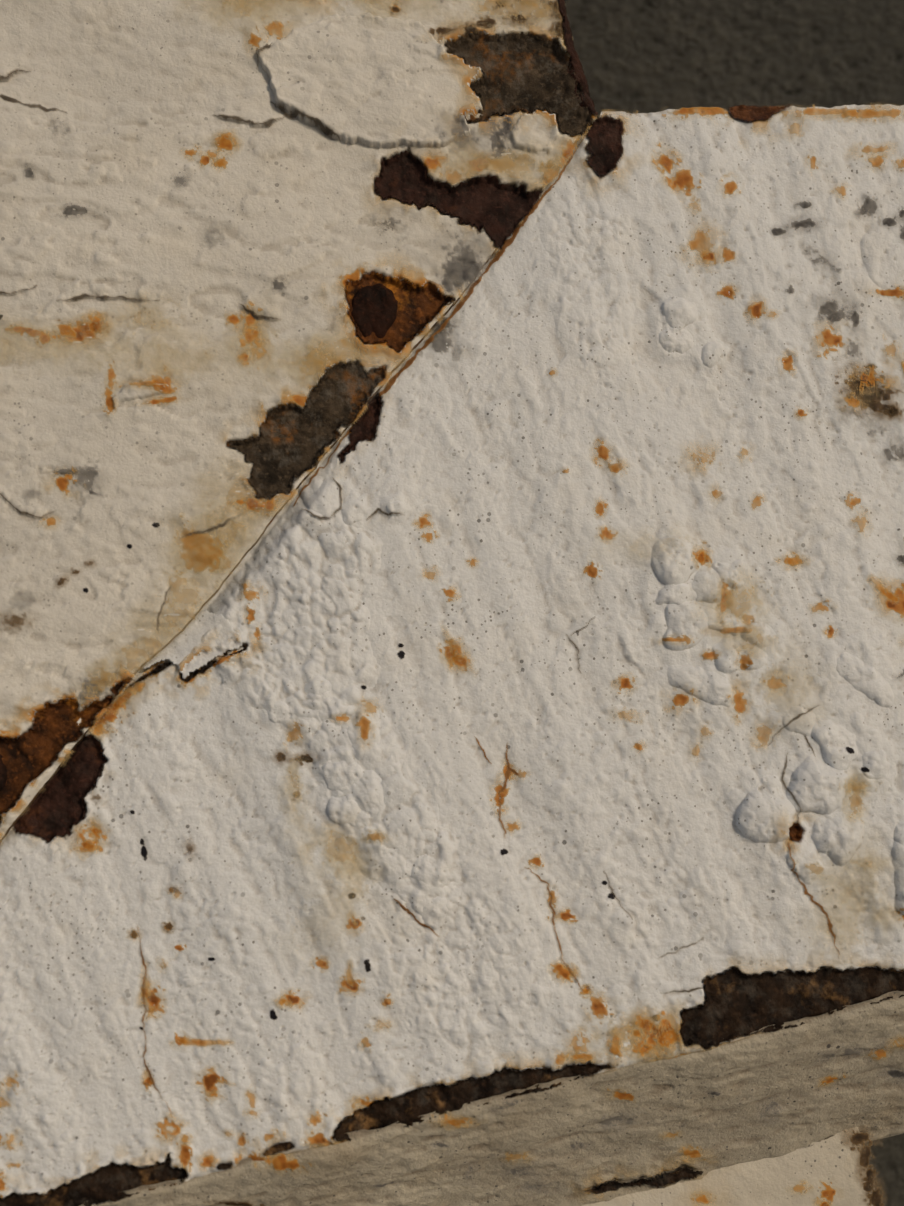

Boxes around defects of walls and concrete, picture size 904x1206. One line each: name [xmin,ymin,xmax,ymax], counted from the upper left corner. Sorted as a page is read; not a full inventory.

rust [430,0,564,40]
crack [0,70,58,112]
crack [214,102,340,140]
peeling [256,0,625,250]
crack [379,133,588,397]
peeling [226,269,455,506]
rust [835,364,902,418]
peeling [0,610,248,843]
crack [769,708,836,945]
rust [551,963,614,1018]
rust [608,1011,686,1061]
peeling [679,966,904,1050]